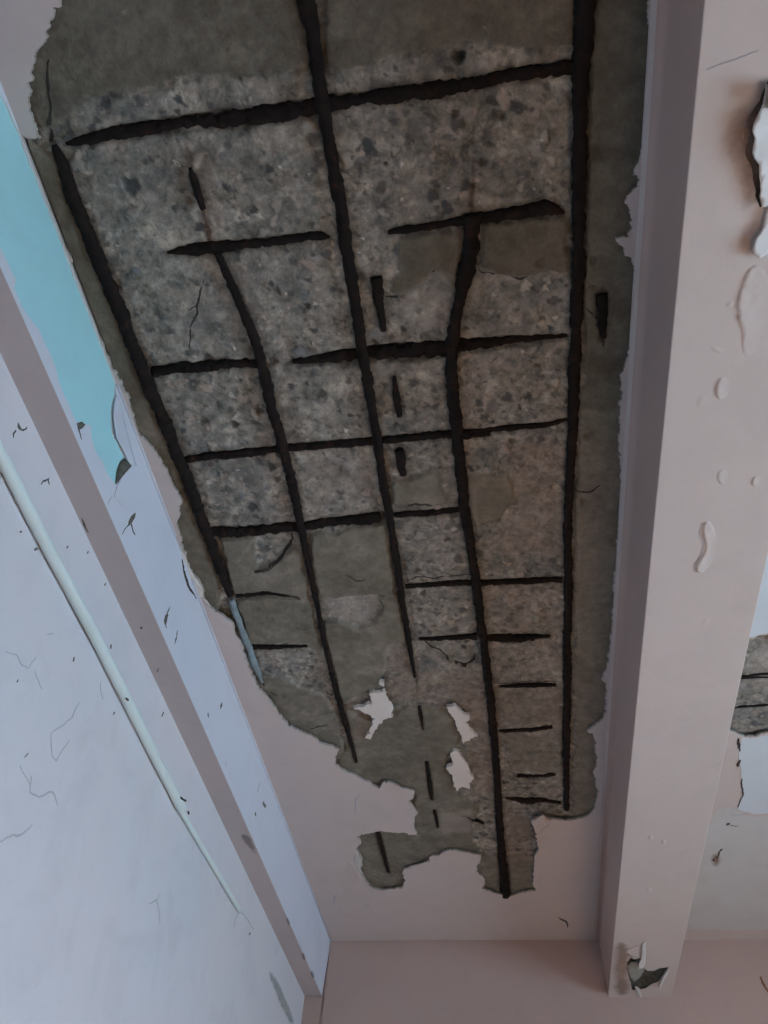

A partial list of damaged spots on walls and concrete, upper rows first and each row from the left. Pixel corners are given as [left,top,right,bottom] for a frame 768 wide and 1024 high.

peeling [745,82,768,259]
spalling [0,0,650,896]
peeling [686,555,768,930]
spalling [625,941,670,998]